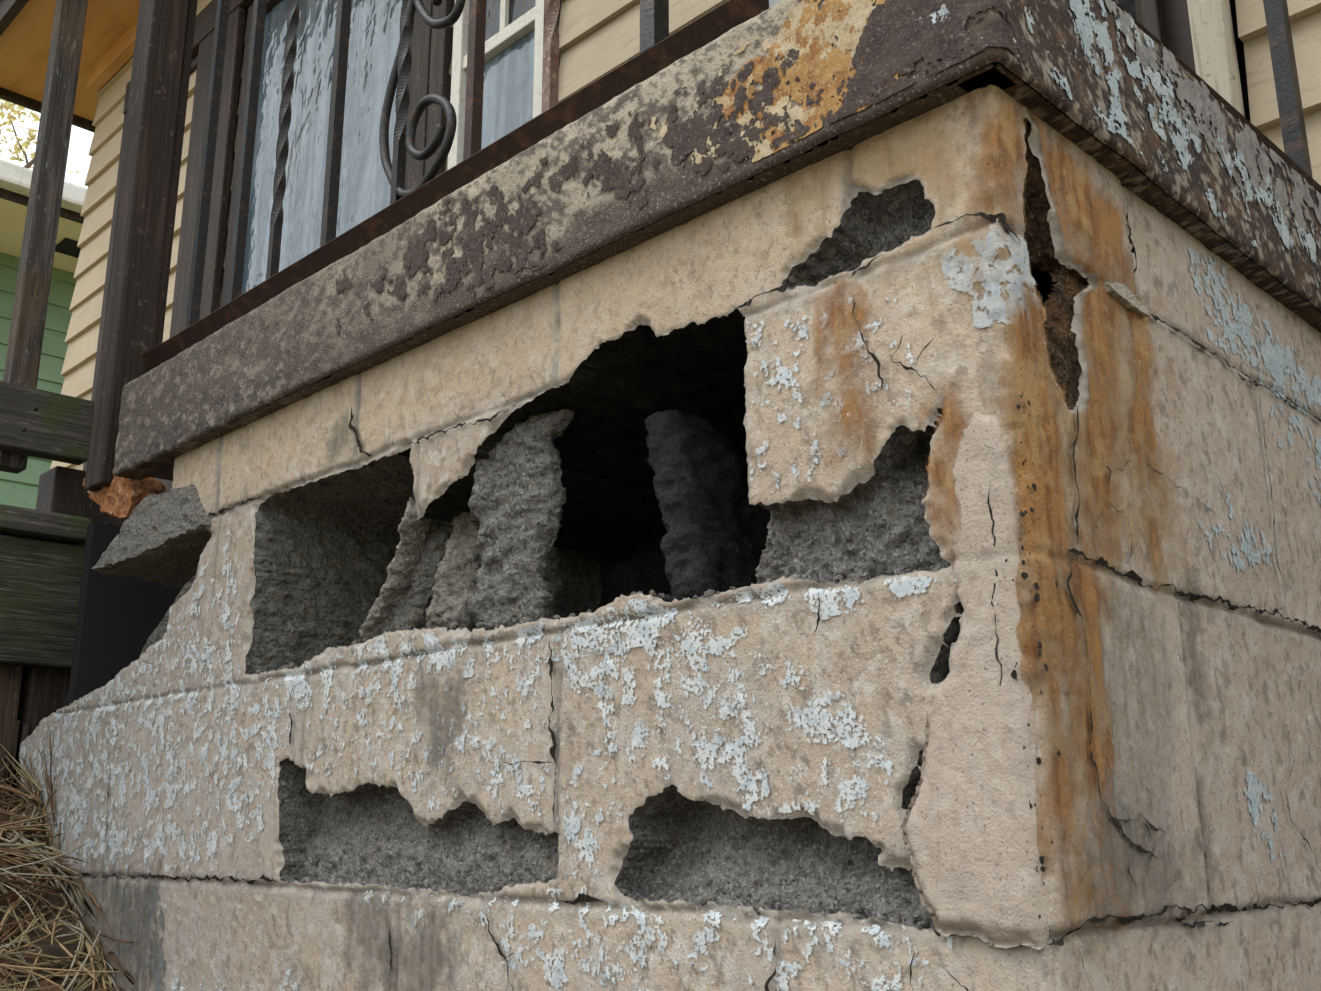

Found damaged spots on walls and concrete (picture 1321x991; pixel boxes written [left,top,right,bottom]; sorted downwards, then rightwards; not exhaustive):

peeling [335,0,1035,324]
rust [718,0,902,156]
water stain [415,674,463,764]
spalling [20,309,959,991]
rust [979,94,1160,840]
crack [1048,209,1321,990]
water stain [57,858,161,991]
water stain [344,889,458,991]